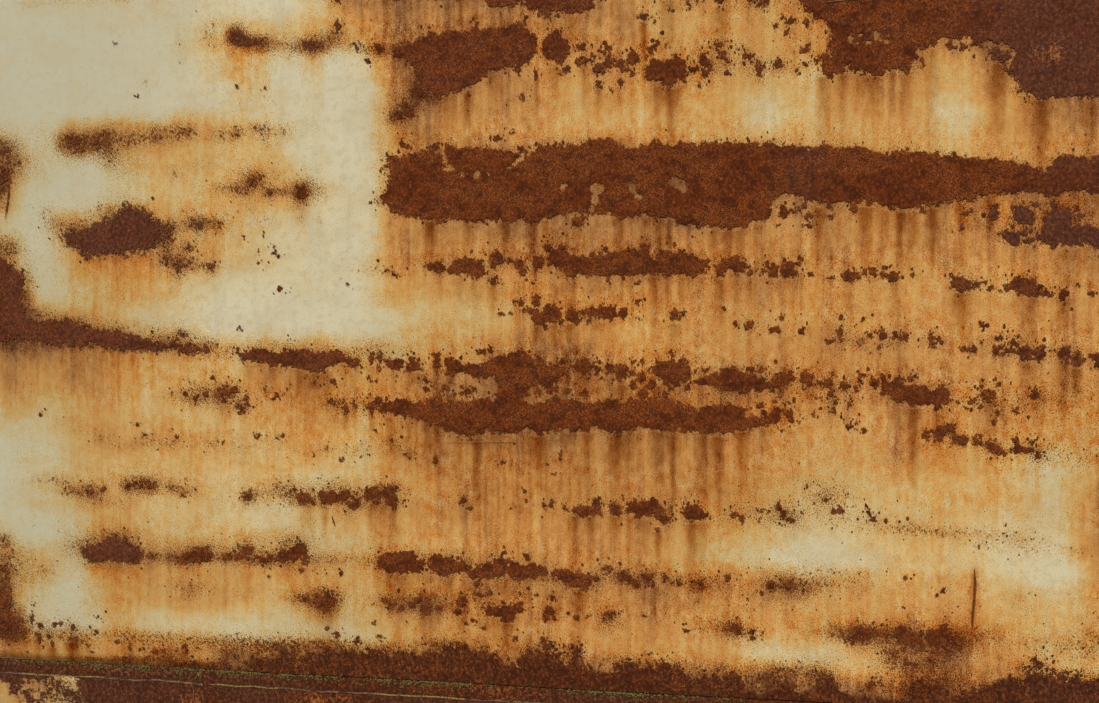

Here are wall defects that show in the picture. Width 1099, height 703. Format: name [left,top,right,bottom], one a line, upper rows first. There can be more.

corrosion [0,114,298,224]
corrosion [38,156,334,297]